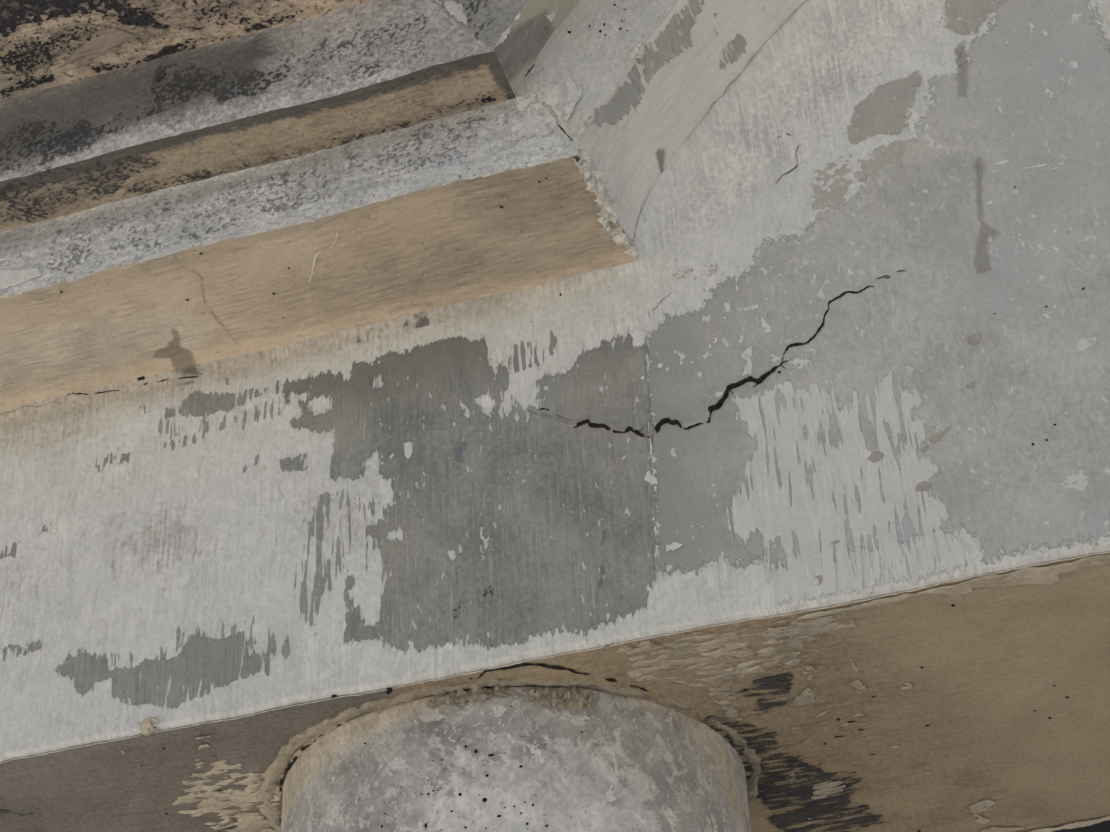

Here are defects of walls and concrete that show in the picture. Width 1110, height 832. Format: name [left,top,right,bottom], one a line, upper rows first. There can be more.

spalling [0,149,638,298]
peeling [164,0,1110,653]
crack [527,270,906,438]
peeling [56,631,273,736]